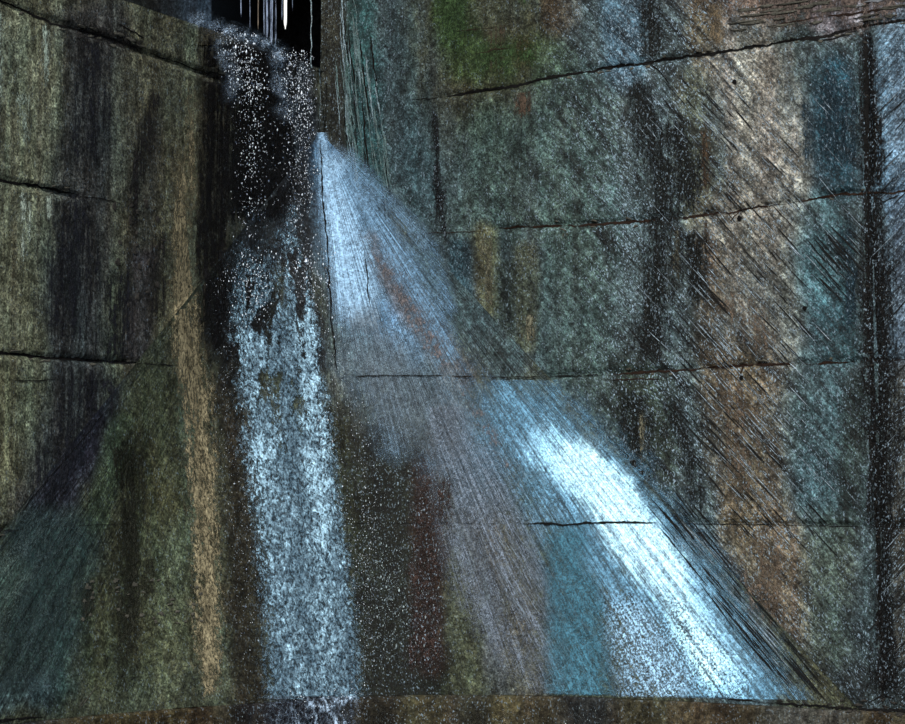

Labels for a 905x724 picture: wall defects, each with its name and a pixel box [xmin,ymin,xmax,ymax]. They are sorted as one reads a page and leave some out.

crack [320,0,905,717]
water stain [669,521,805,706]
water stain [751,33,905,692]